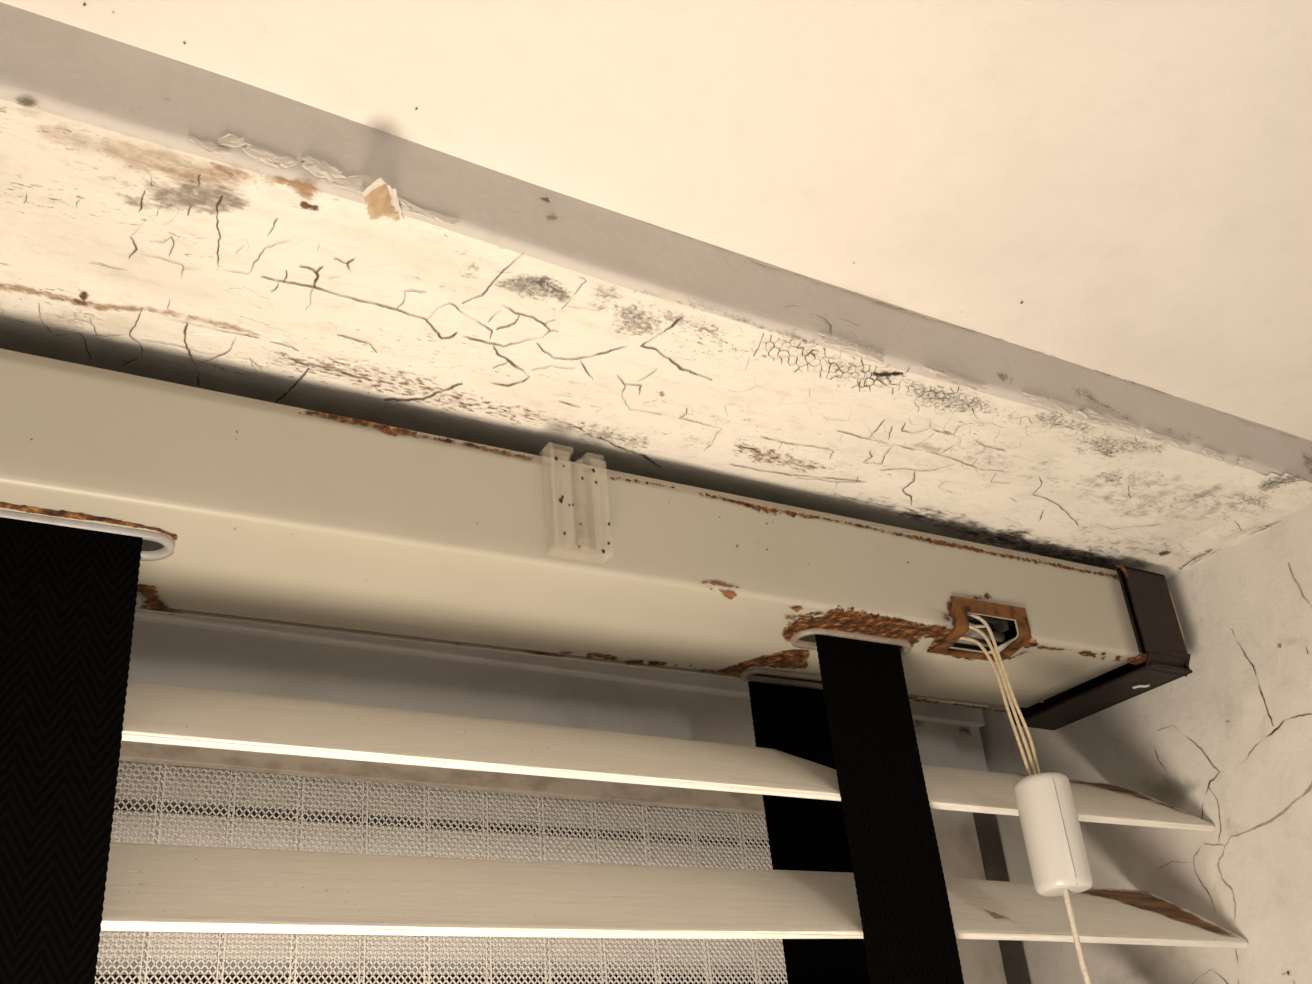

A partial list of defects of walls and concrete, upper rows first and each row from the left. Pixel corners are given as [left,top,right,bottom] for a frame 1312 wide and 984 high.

peeling [189,134,459,226]
water stain [499,277,568,301]
crack [39,174,1119,529]
water stain [873,372,977,409]
rust [298,411,534,460]
rust [0,502,177,542]
rust [700,493,1121,581]
water stain [906,514,1112,564]
rust [525,601,956,675]
crack [1231,629,1311,756]
crack [1155,727,1235,909]
crack [1255,786,1312,829]